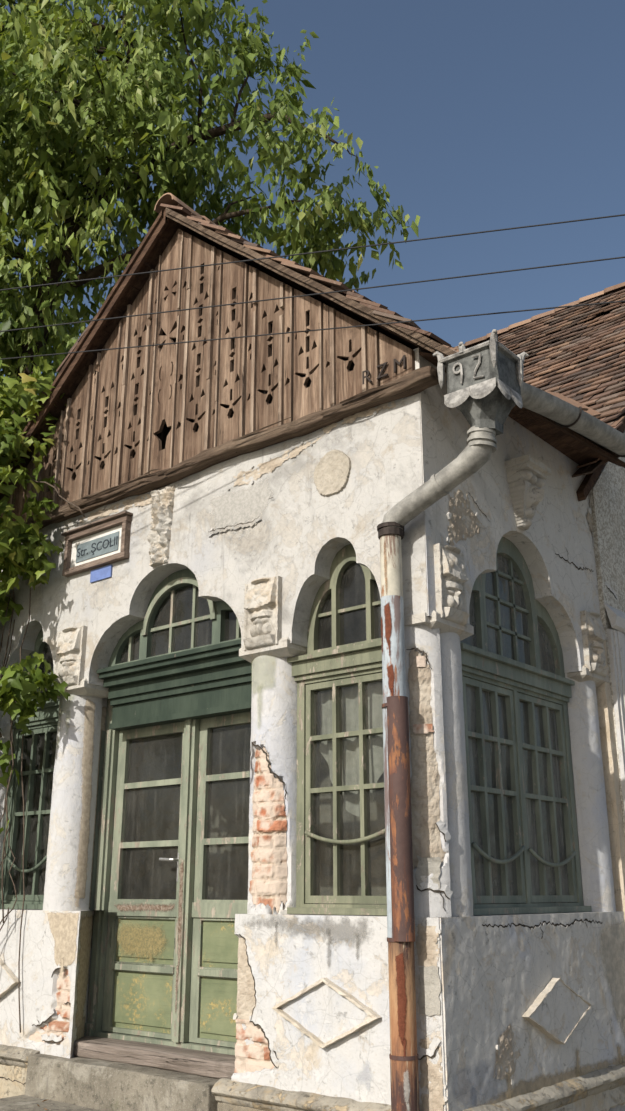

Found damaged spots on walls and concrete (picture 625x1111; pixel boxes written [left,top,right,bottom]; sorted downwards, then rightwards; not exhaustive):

peeling [29,699,107,1044]
flaking render [249,742,288,914]
flaking render [406,648,446,869]
flaking render [233,938,279,1073]
rust [395,953,407,1057]